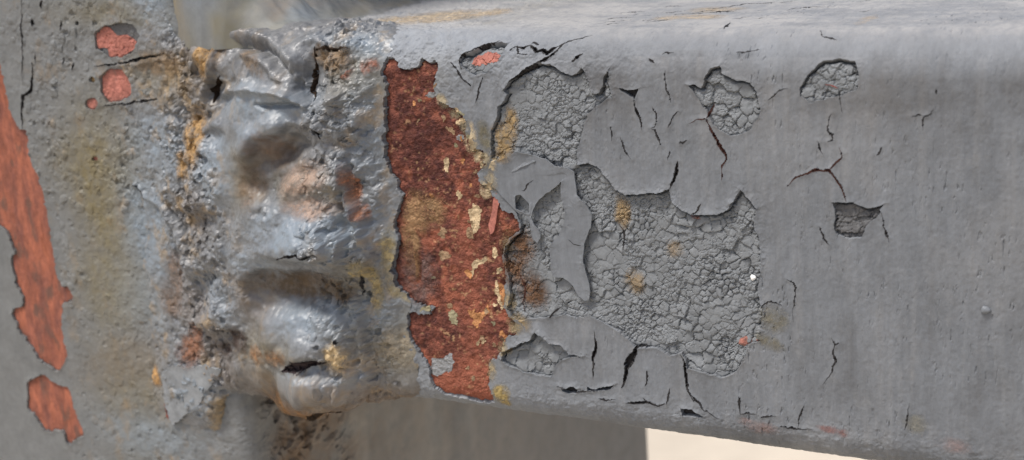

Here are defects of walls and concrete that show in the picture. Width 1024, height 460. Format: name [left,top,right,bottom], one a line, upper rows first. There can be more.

crack [610,52,727,189]
crack [790,84,846,201]
peeling [801,62,859,103]
corrosion [261,59,544,405]
peeling [483,65,763,377]
peeling [835,202,883,238]
crack [559,332,811,430]
crack [824,338,837,383]